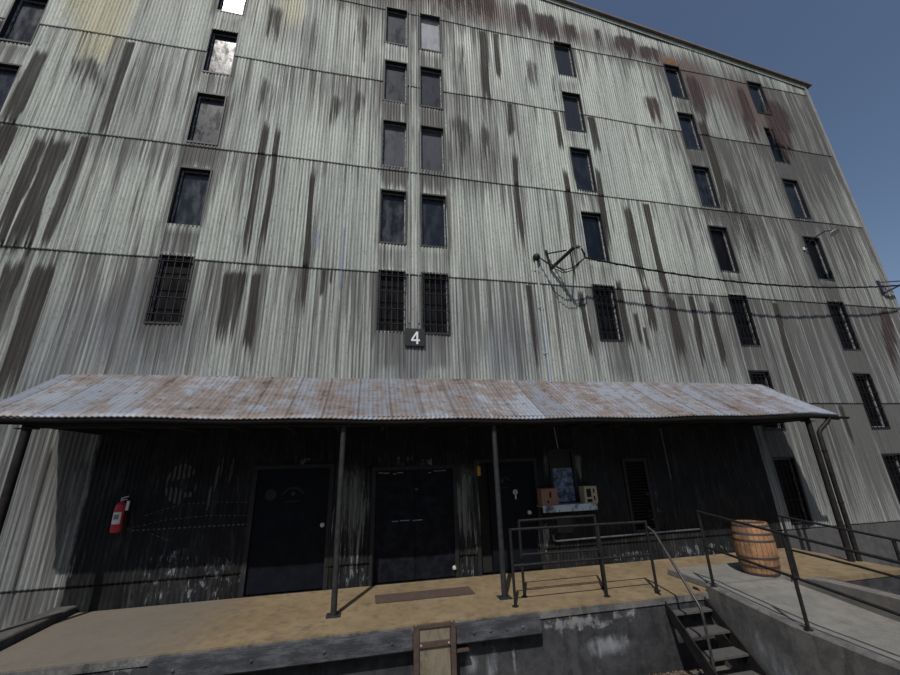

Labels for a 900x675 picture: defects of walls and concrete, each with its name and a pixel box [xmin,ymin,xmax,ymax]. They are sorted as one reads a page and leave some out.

corrosion [428,0,498,20]
corrosion [514,3,578,44]
corrosion [612,36,679,66]
corrosion [644,96,662,128]
corrosion [738,89,799,168]
damp [0,41,135,398]
damp [216,80,281,354]
damp [300,173,316,315]
damp [512,156,525,249]
damp [563,171,596,360]
damp [616,203,687,358]
peeling [545,615,606,633]